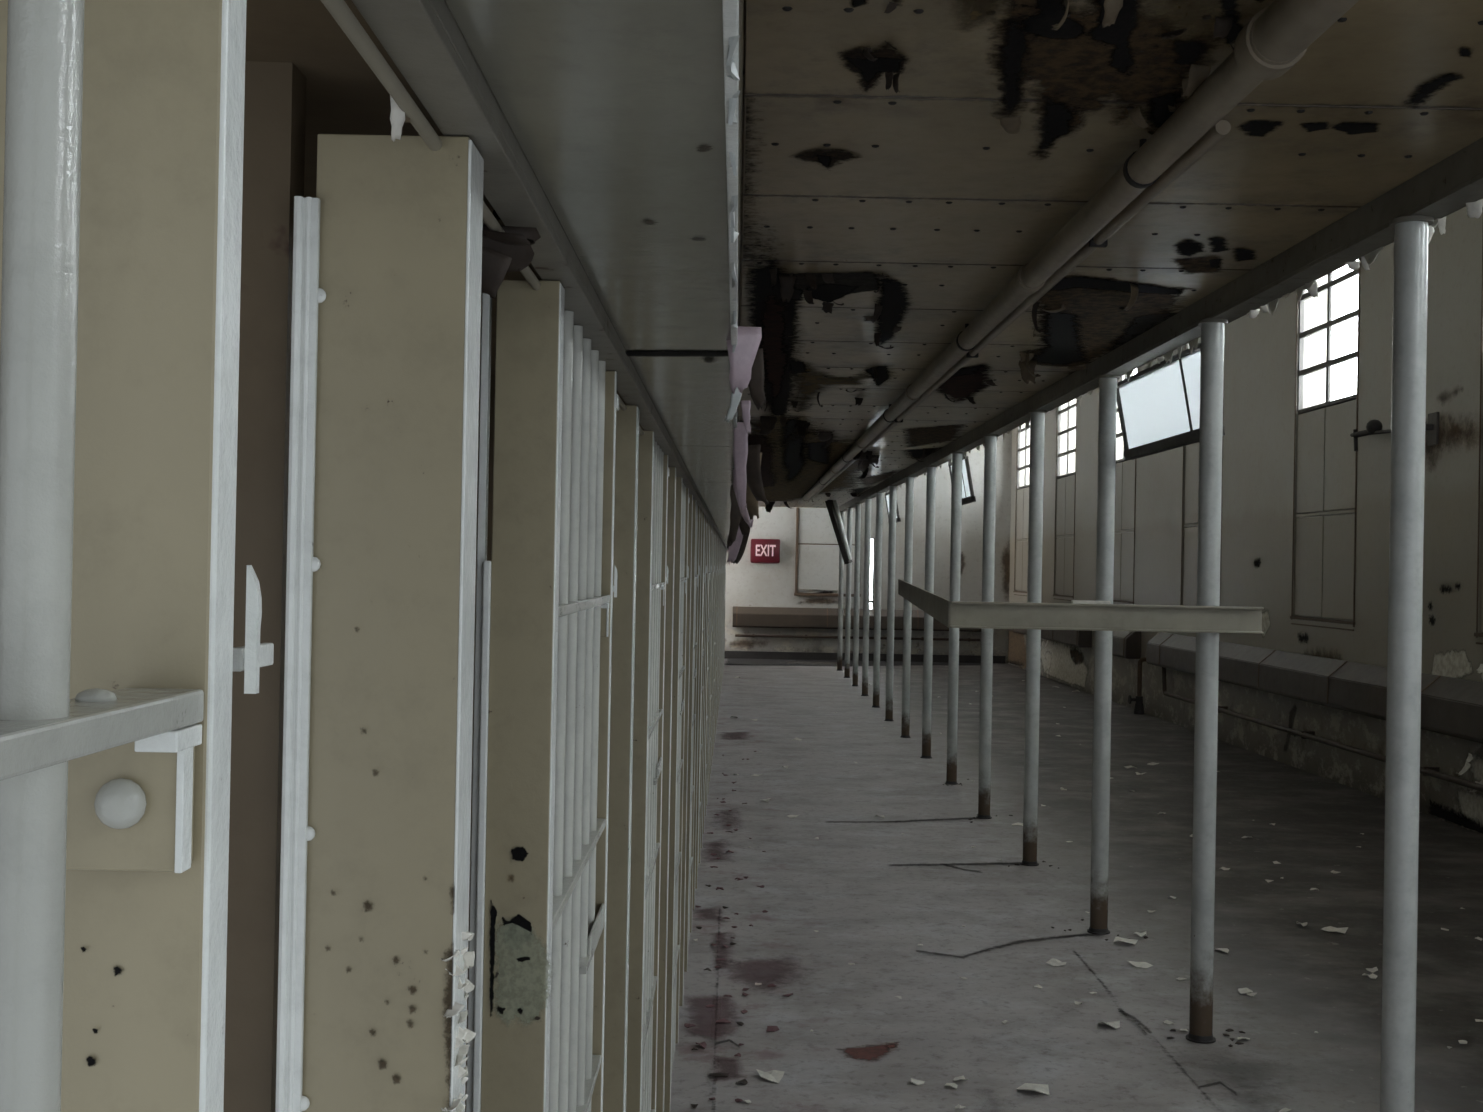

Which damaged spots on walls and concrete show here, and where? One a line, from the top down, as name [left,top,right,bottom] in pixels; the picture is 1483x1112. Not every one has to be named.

peeling [989,0,1243,158]
peeling [1466,199,1483,219]
peeling [1428,217,1446,244]
peeling [1305,281,1318,298]
peeling [772,272,910,349]
peeling [1248,305,1269,318]
peeling [1019,276,1192,384]
spalling [1432,650,1483,680]
spalling [509,847,529,881]
spalling [441,900,550,1112]